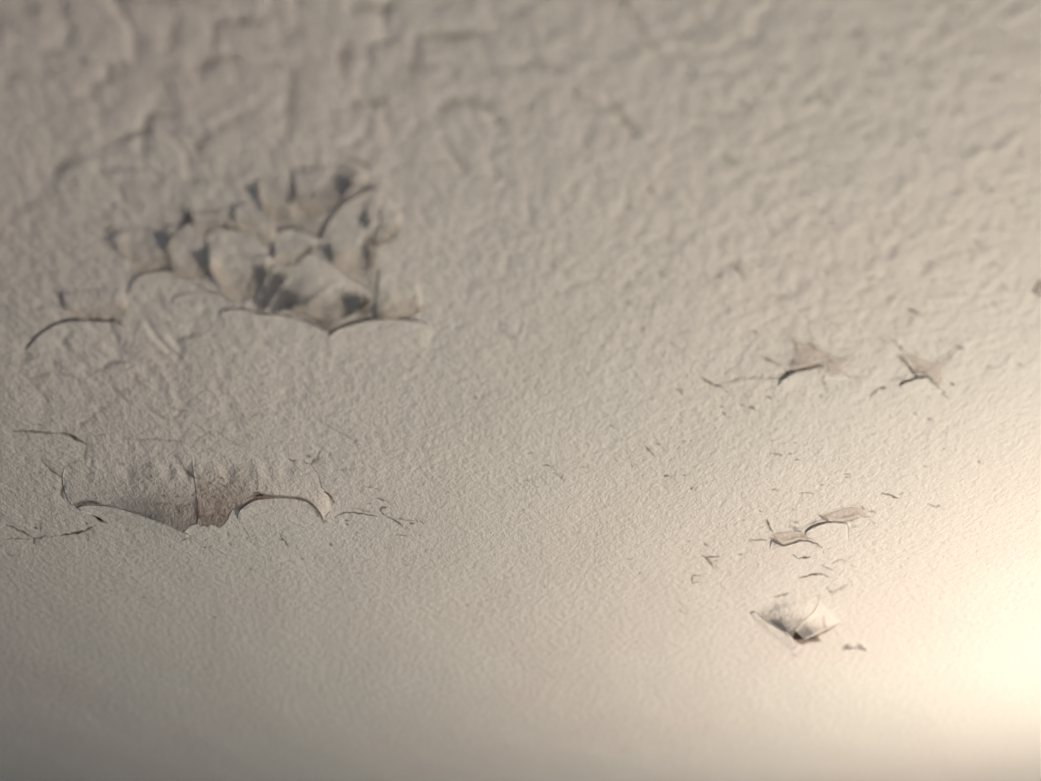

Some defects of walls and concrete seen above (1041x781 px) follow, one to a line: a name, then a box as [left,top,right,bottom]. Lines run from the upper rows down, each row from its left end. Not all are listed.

spalling [726,343,845,391]
spalling [900,355,951,395]
peeling [63,458,334,541]
crack [10,523,92,541]
spalling [767,508,864,555]
peeling [750,595,841,650]